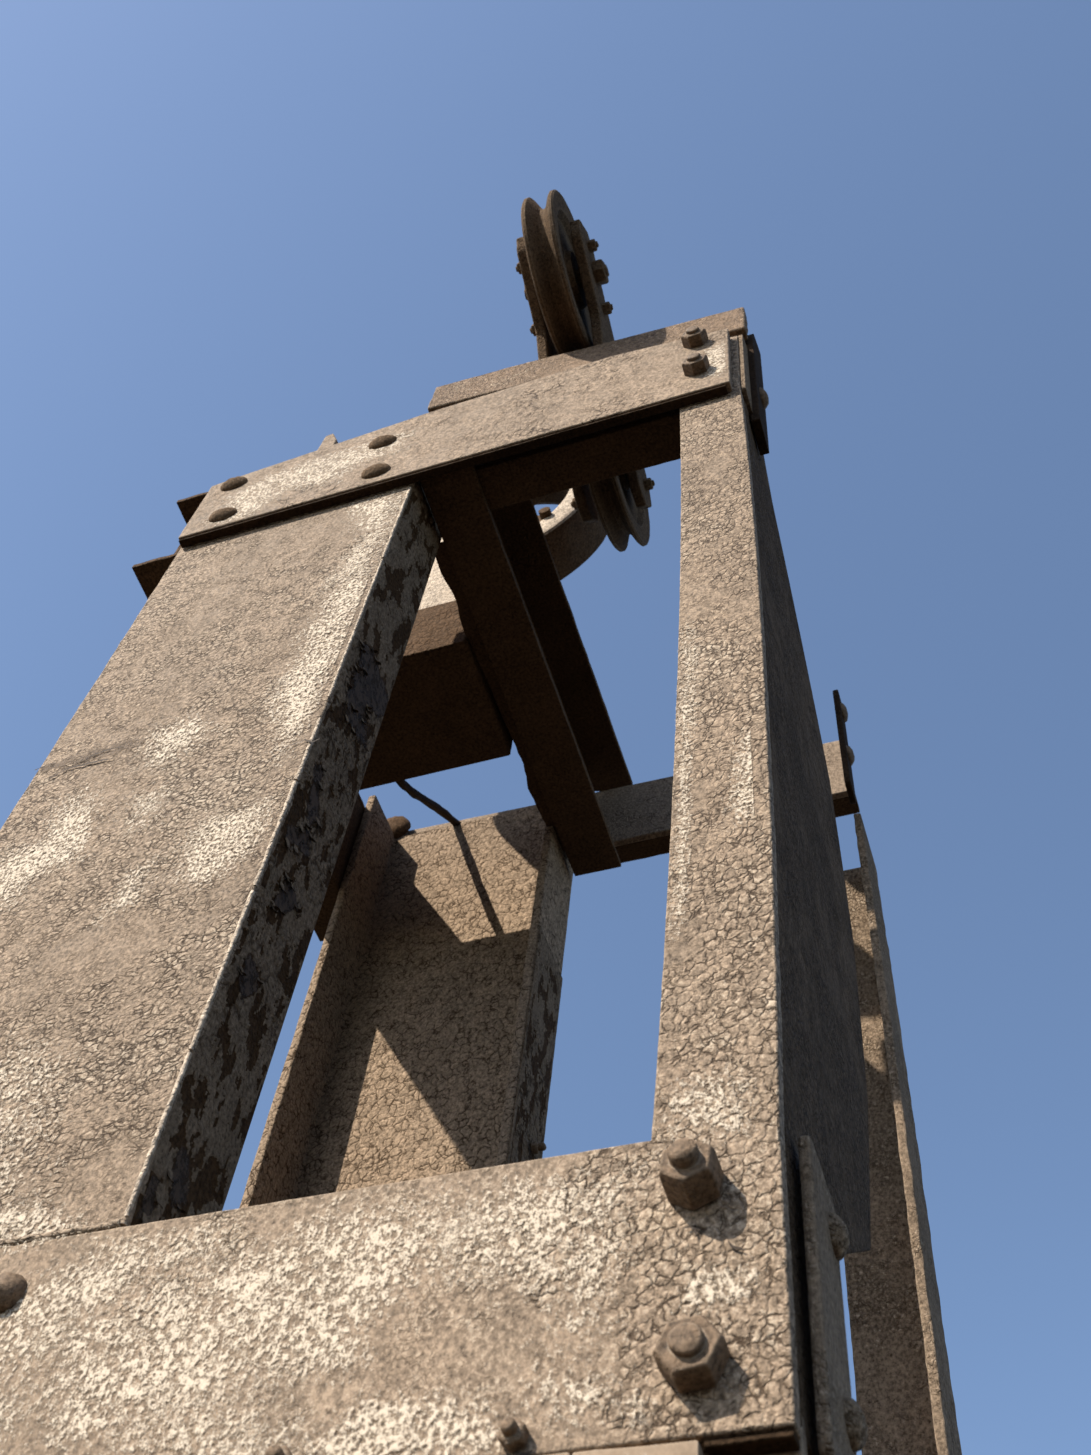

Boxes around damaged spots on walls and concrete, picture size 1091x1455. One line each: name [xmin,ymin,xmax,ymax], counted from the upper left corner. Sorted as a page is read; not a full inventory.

peeling [0,487,657,1455]
peeling [669,625,699,939]